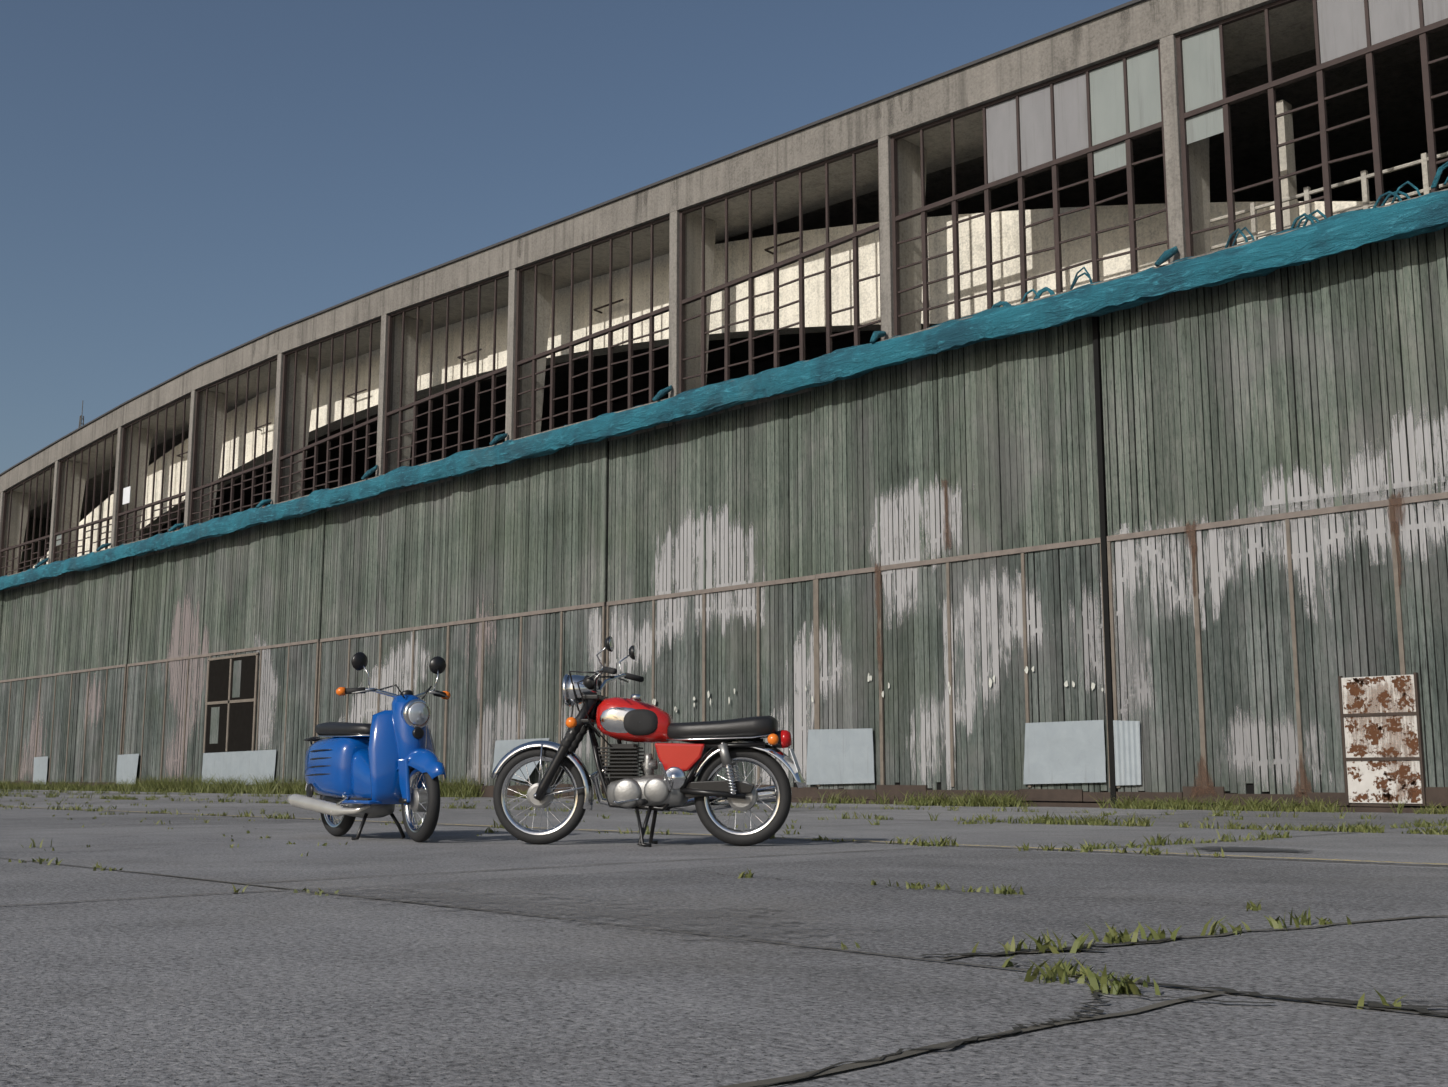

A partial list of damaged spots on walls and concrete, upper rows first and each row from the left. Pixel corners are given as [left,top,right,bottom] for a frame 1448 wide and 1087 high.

peeling [589,504,765,681]
peeling [870,475,962,626]
peeling [1064,407,1448,721]
peeling [339,630,430,724]
peeling [561,704,590,758]
peeling [910,570,1043,790]
peeling [1225,712,1332,789]
rust [1343,675,1422,803]
crack [700,870,1448,1087]